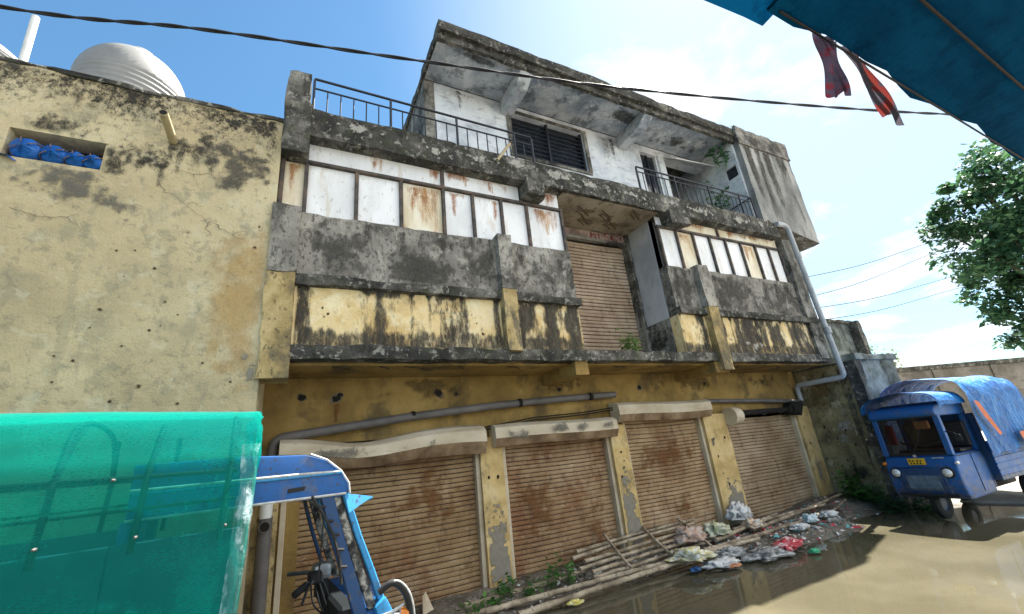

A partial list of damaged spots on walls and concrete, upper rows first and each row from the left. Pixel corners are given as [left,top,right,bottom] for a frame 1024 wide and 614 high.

water stain [0,62,277,221]
crack [157,170,246,239]
water stain [312,218,372,271]
water stain [389,232,495,284]
water stain [744,136,790,204]
water stain [293,286,504,349]
water stain [518,255,585,350]
water stain [807,369,873,487]
peeling [620,451,644,549]
peeling [488,504,512,587]